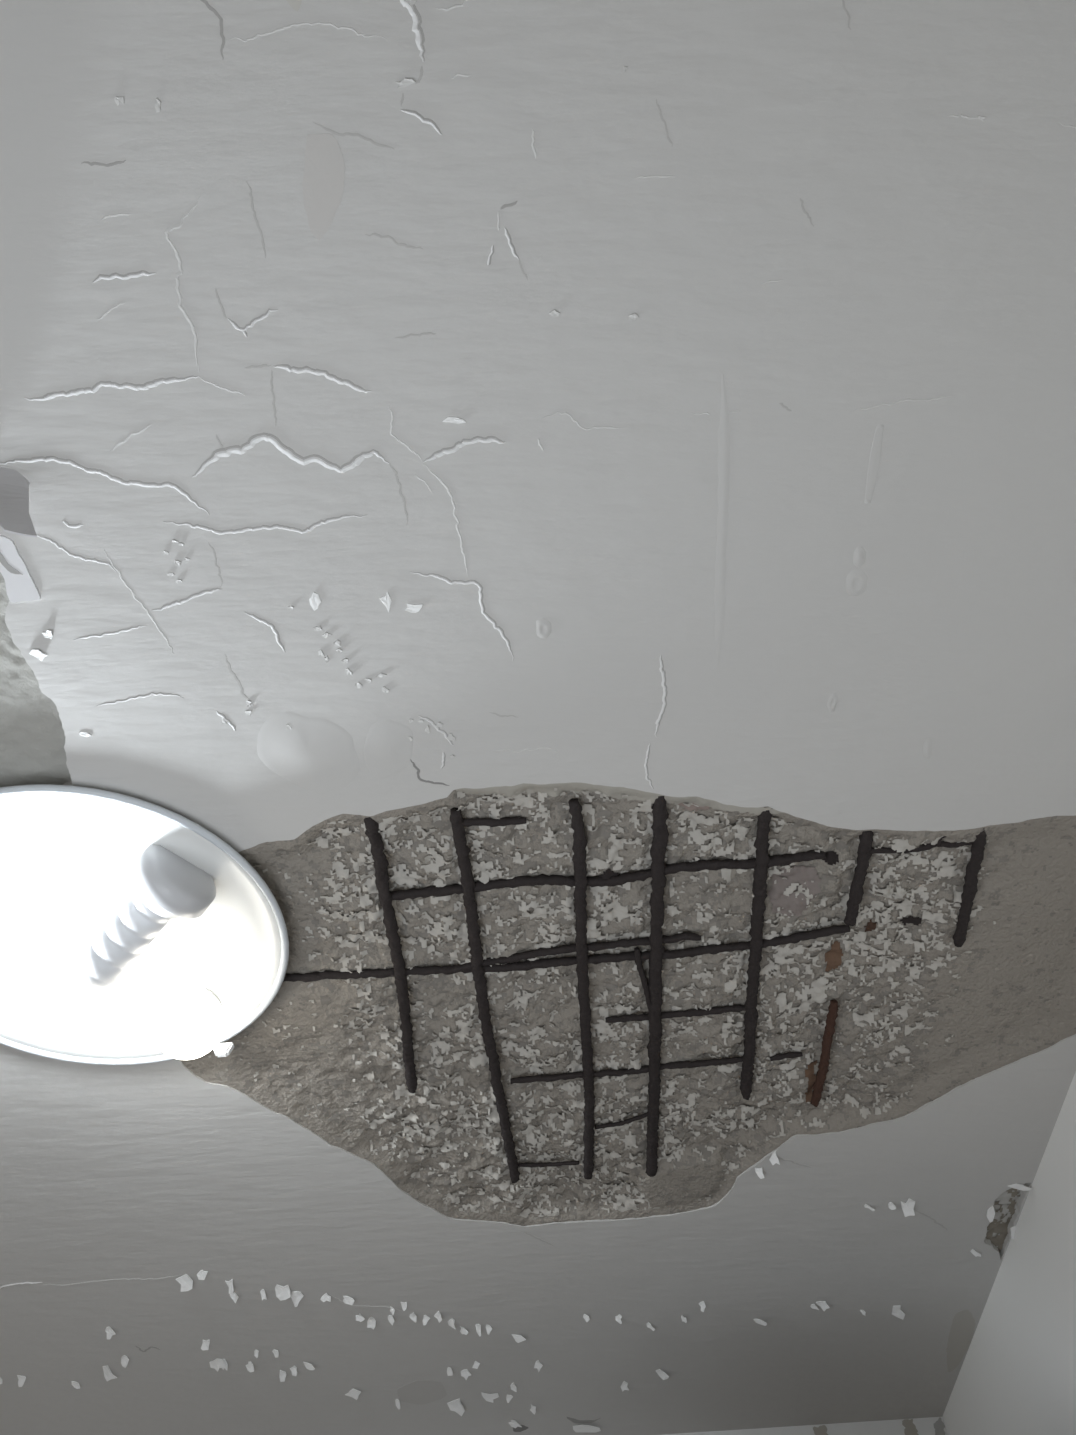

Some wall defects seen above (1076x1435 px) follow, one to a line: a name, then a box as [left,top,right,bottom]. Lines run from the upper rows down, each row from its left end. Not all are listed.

crack [201,0,471,135]
crack [81,159,126,167]
crack [0,196,625,662]
crack [96,692,183,707]
crack [216,655,254,731]
corrosion [825,941,843,972]
spalling [181,782,1076,1226]
corrosion [804,1060,818,1102]
spalling [970,1183,1032,1257]
peeling [176,1270,208,1292]
peeling [260,1285,492,1336]
peeling [246,1349,315,1382]